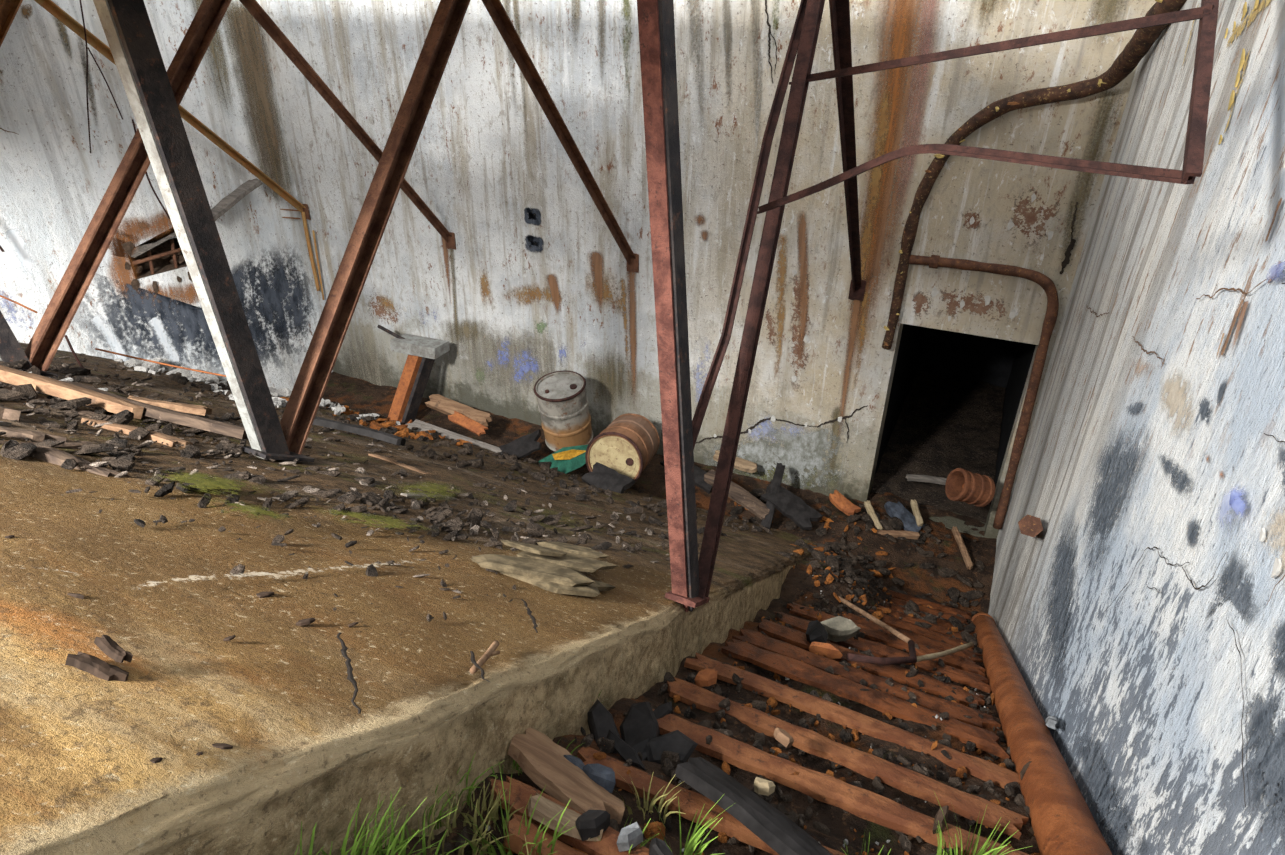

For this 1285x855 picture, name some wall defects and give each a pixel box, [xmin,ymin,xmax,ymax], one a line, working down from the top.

leakage [207,2,291,195]
corrosion [841,0,936,426]
spalling [108,210,199,304]
leakage [92,281,221,366]
leakage [231,258,310,365]
corrosion [512,274,562,311]
corrosion [587,252,636,388]
crack [696,405,868,443]
peeling [1187,521,1199,545]
crack [1104,546,1227,612]
peeling [1208,557,1253,619]
crack [337,632,362,714]